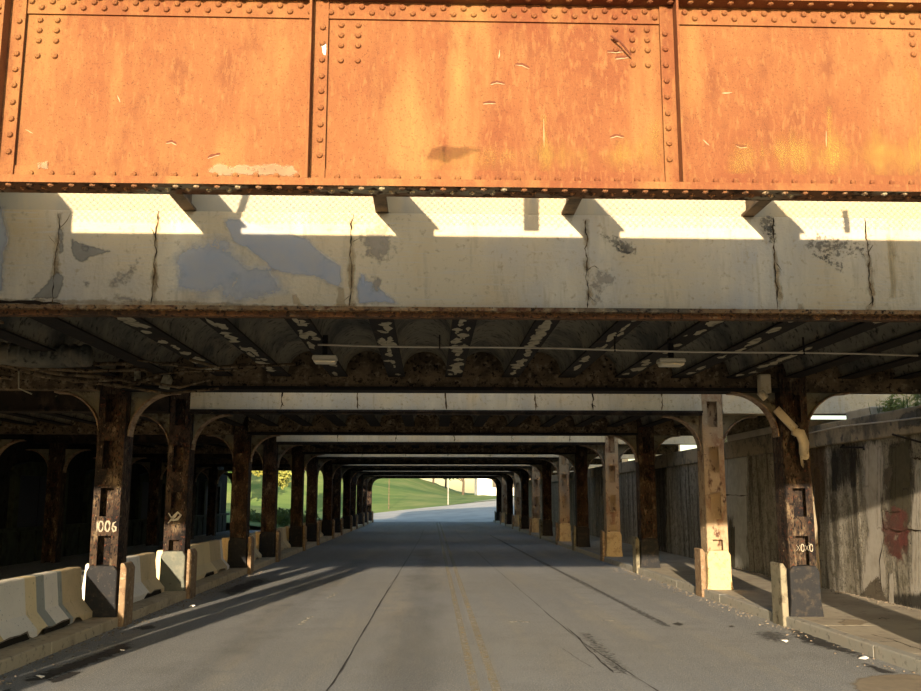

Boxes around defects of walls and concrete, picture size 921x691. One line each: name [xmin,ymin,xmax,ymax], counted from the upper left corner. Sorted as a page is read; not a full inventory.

peeling [208,153,297,176]
crack [0,212,72,304]
spalling [58,229,110,262]
crack [151,214,159,302]
crack [345,214,357,306]
crack [772,217,781,309]
crack [865,220,874,305]
peeling [206,319,276,372]
peeling [377,322,401,375]
peeling [448,320,471,375]
peeling [510,320,552,375]
damp [831,408,921,610]